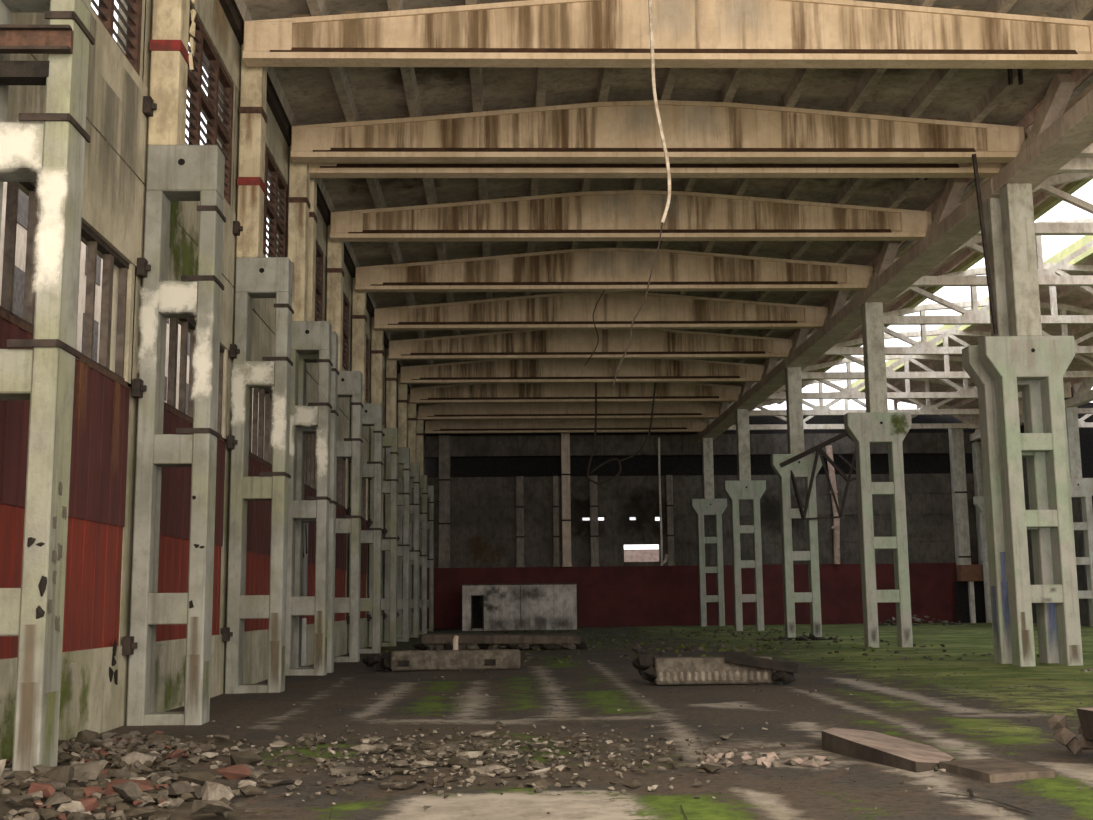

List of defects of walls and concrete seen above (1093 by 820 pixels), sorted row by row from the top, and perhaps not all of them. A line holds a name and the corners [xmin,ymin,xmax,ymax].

leakage [427,6,459,48]
leakage [473,2,487,48]
leakage [519,0,566,48]
leakage [594,0,610,48]
leakage [442,109,498,148]
leakage [552,103,568,148]
peeling [0,126,67,282]
leakage [169,201,198,275]
peeling [139,282,197,357]
peeling [231,362,273,424]
peeling [53,481,67,529]
spalling [27,537,63,632]